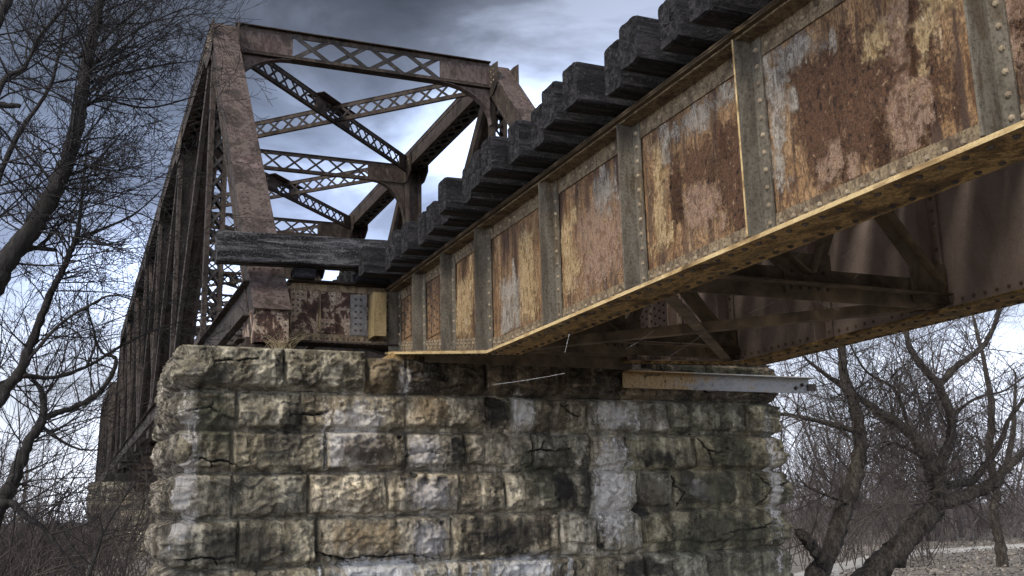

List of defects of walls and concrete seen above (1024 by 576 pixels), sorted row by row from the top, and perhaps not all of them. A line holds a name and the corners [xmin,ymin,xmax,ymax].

corrosion [786,0,962,191]
corrosion [668,119,746,232]
crack [190,457,237,467]
crack [526,441,570,453]